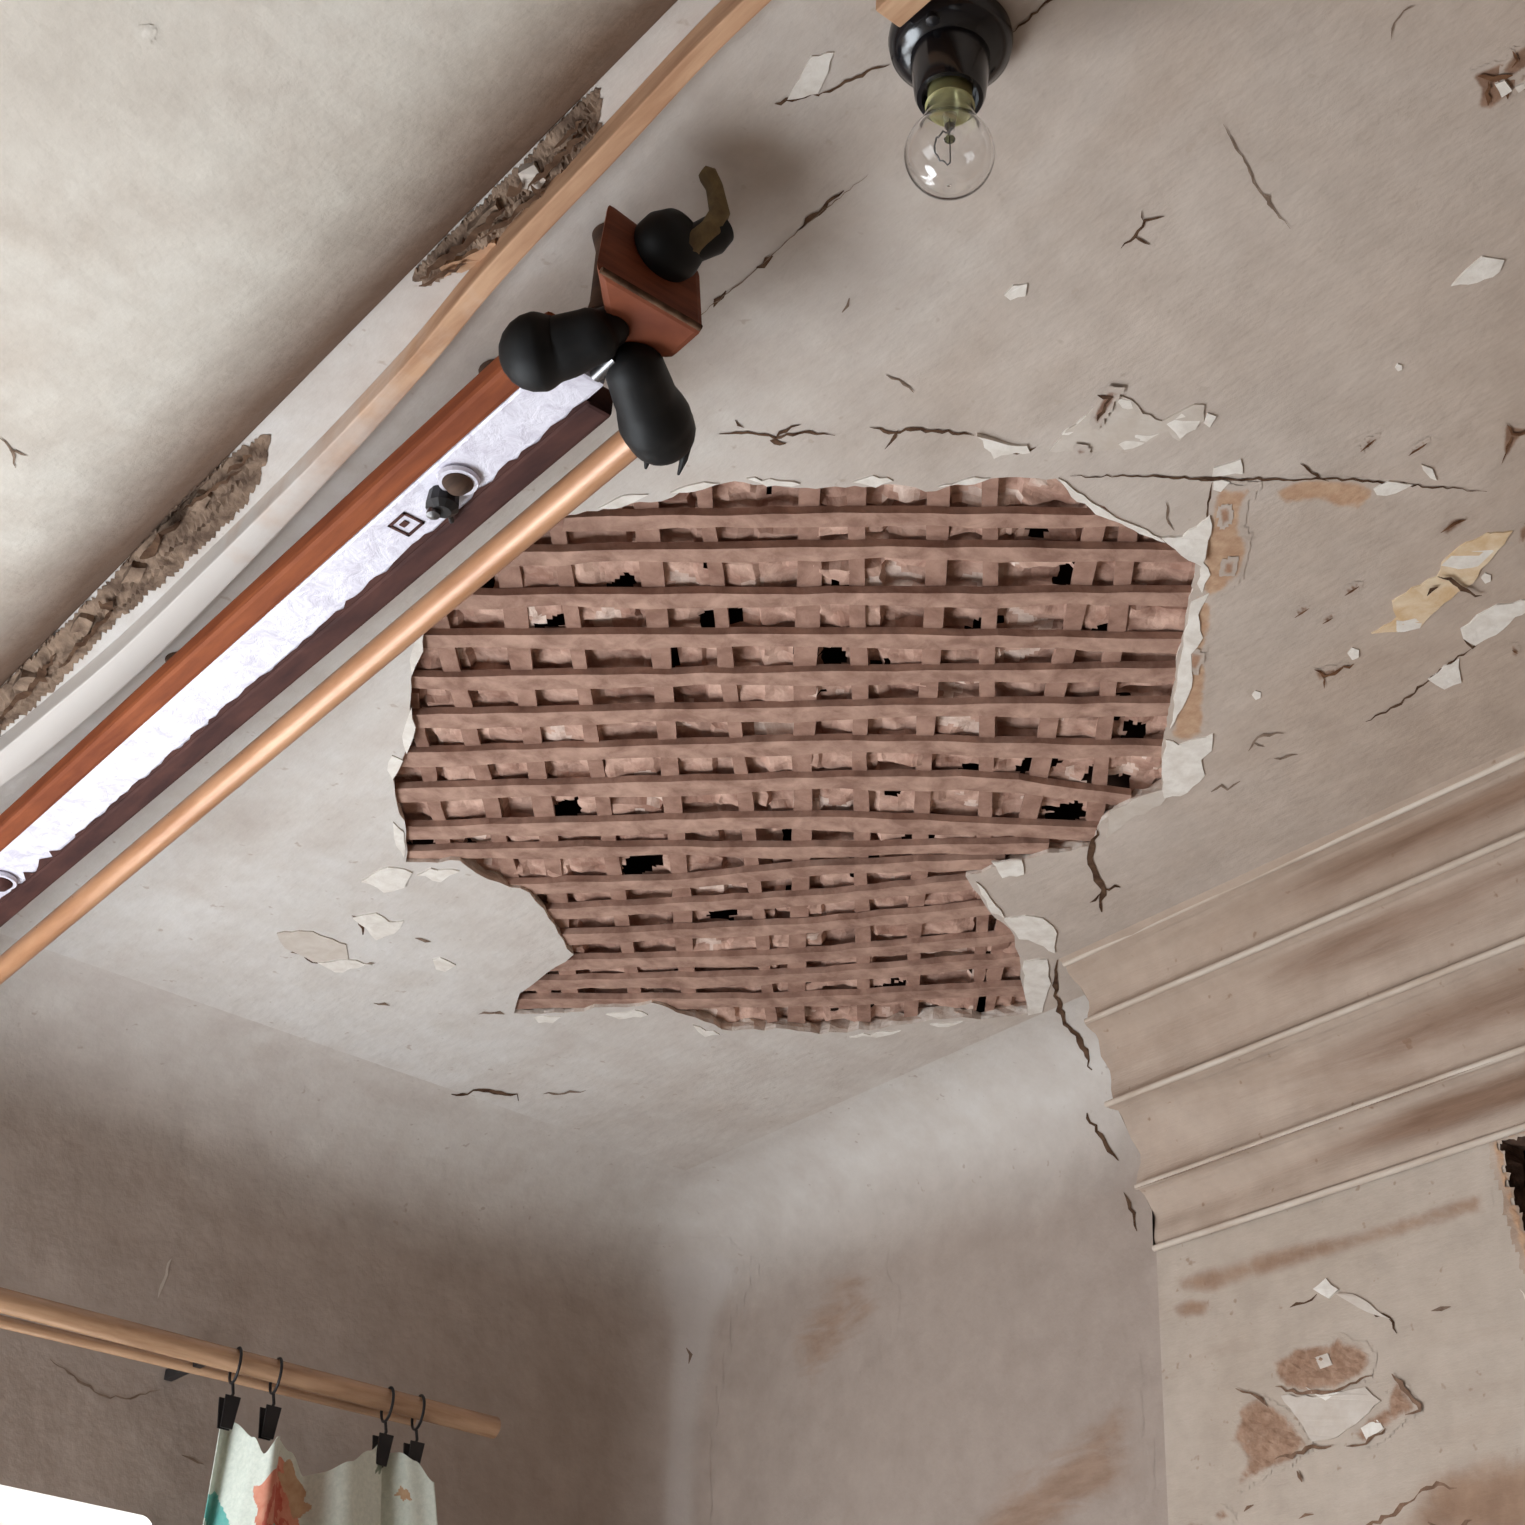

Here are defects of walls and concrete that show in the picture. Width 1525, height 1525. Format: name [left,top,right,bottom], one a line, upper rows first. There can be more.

spalling [412,88,603,287]
crack [721,420,835,446]
crack [870,375,1036,459]
crack [1078,464,1487,531]
spalling [0,434,271,735]
peeling [1371,513,1525,634]
peeling [1058,477,1213,839]
crack [1087,829,1120,912]
peeling [976,881,1057,1015]
crack [1052,960,1092,1070]
crack [1086,1113,1137,1231]
spalling [1227,1332,1423,1511]